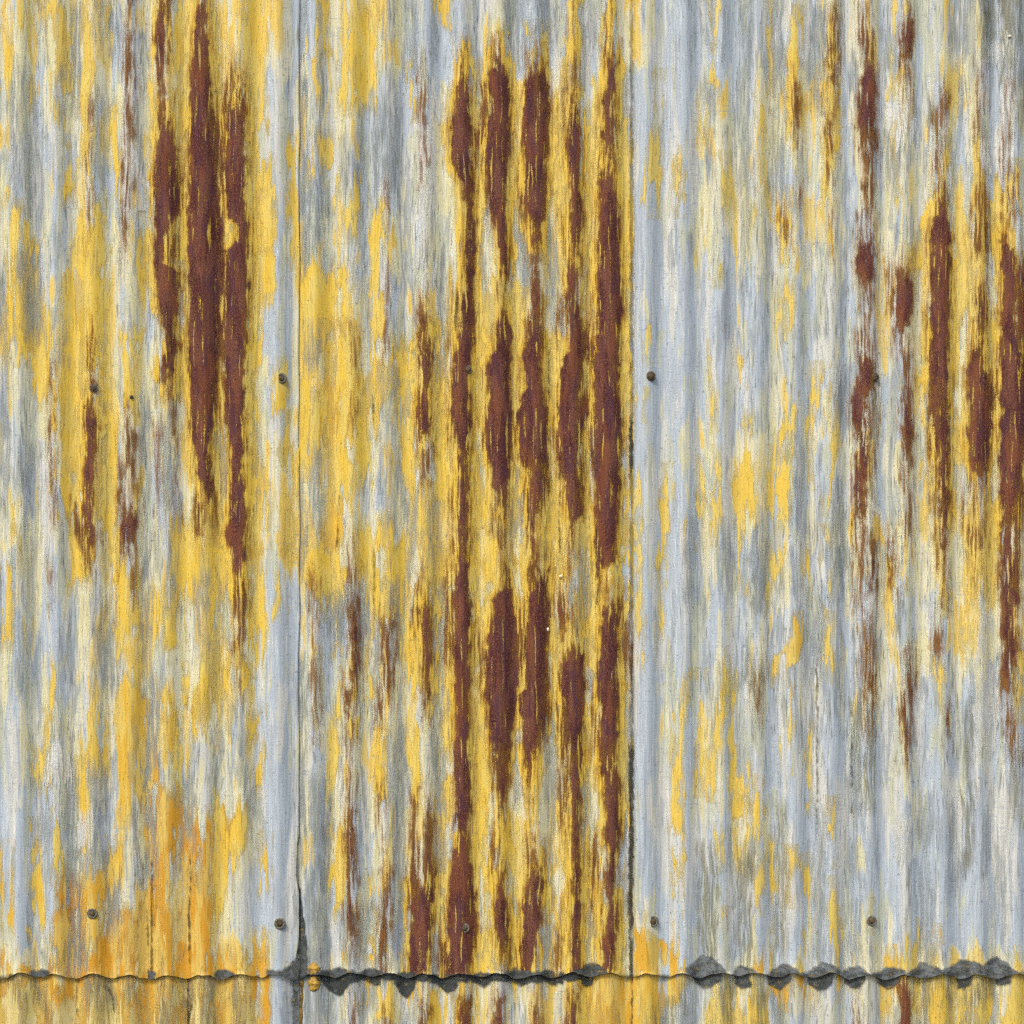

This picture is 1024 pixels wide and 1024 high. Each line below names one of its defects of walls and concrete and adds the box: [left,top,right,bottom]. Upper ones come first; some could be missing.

rust [74,351,140,567]
rust [146,0,258,656]
peeling [0,0,454,1024]
rust [377,25,633,978]
peeling [536,0,687,660]
peeling [566,919,689,1024]
peeling [671,649,813,1024]
peeling [684,356,832,593]
rust [861,626,876,721]
rust [898,663,917,759]
rust [849,4,1024,693]
peeling [928,52,1022,484]